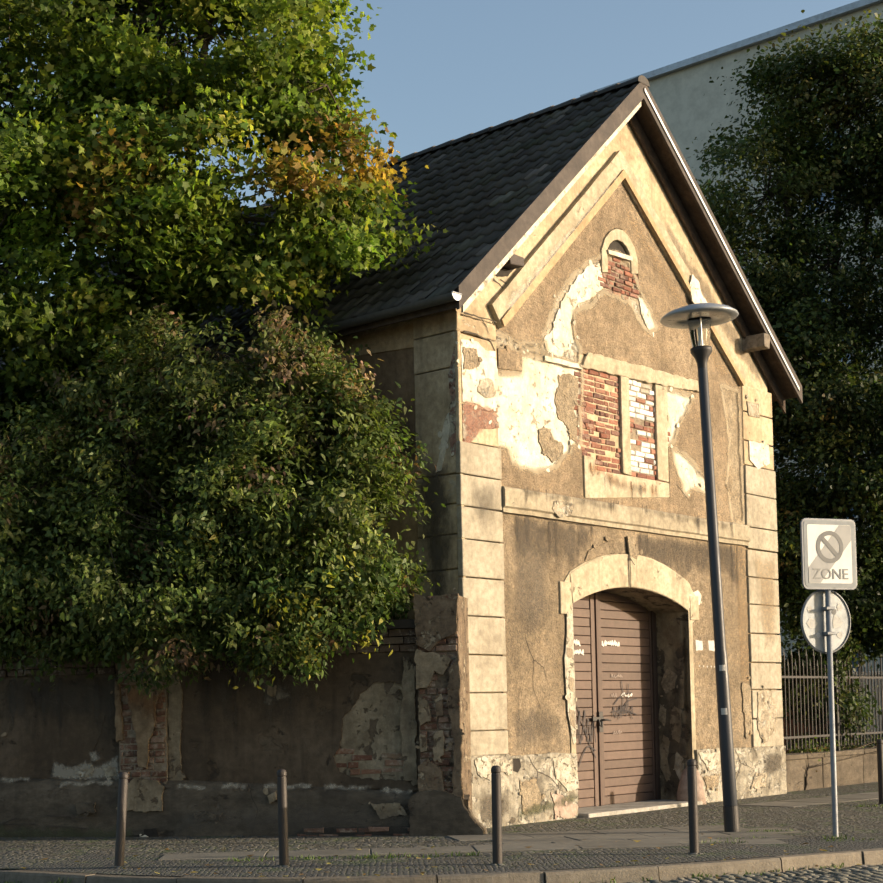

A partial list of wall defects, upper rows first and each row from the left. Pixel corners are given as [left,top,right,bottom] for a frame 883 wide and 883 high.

flaking render [456,251,658,474]
peeling [436,413,454,472]
flaking render [666,387,705,497]
flaking render [720,383,770,525]
peeling [116,664,185,812]
flaking render [334,681,404,780]
peeling [658,667,685,781]